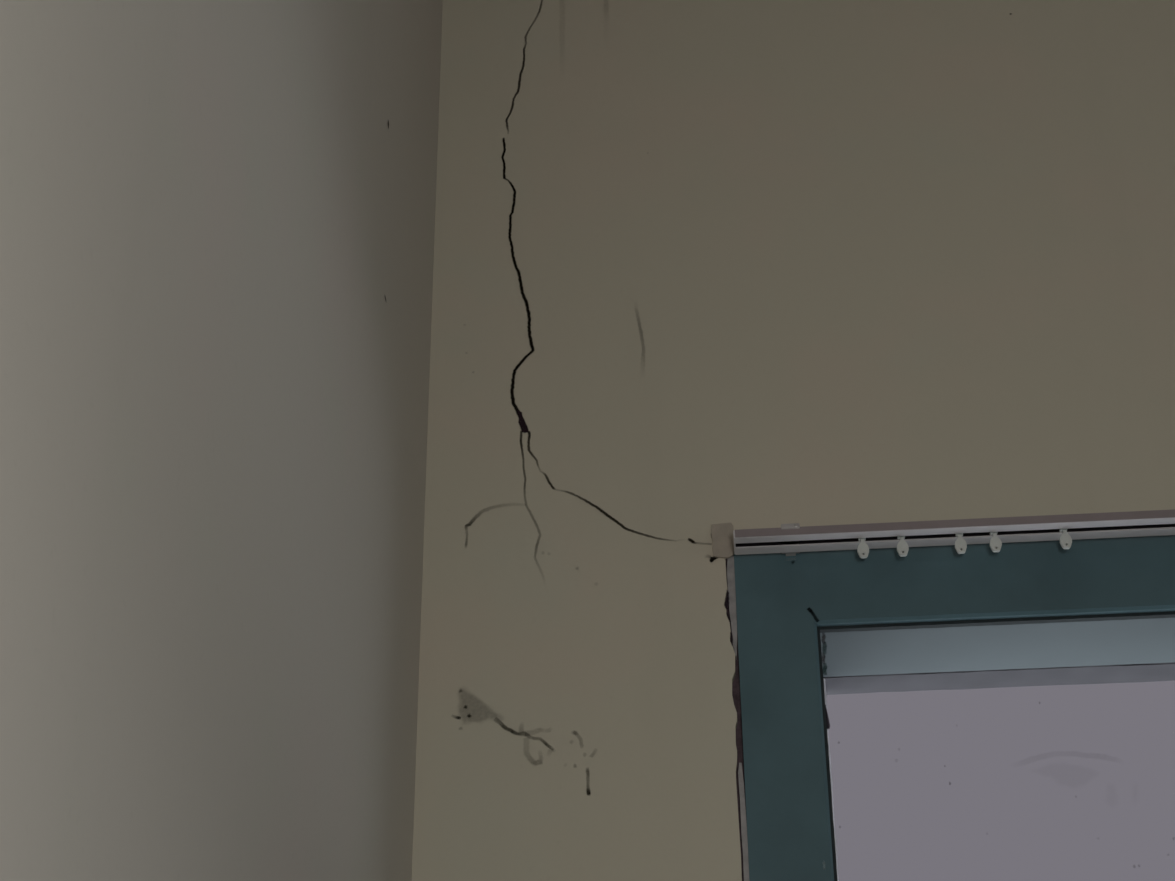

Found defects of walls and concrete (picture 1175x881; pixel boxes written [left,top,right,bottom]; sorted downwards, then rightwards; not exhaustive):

crack [501,2,654,538]